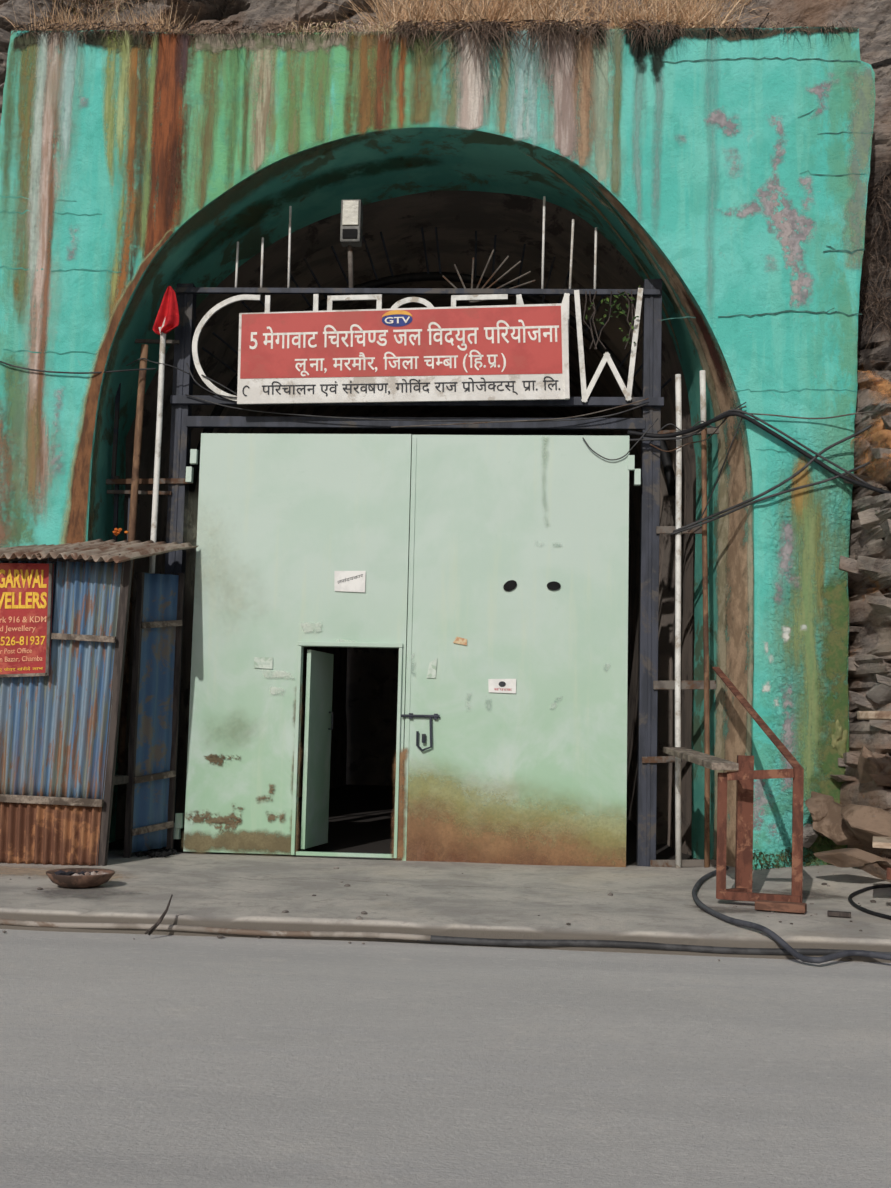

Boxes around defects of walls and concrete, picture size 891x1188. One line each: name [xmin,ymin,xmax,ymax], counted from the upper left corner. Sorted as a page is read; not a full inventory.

corrosion [4,42,51,315]
corrosion [61,32,435,544]
leakage [407,28,663,279]
peeling [707,110,739,136]
peeling [725,117,813,306]
crack [663,57,891,67]
peeling [810,83,830,113]
corrosion [597,185,753,867]
corrosion [182,746,300,854]
corrosion [393,749,626,867]